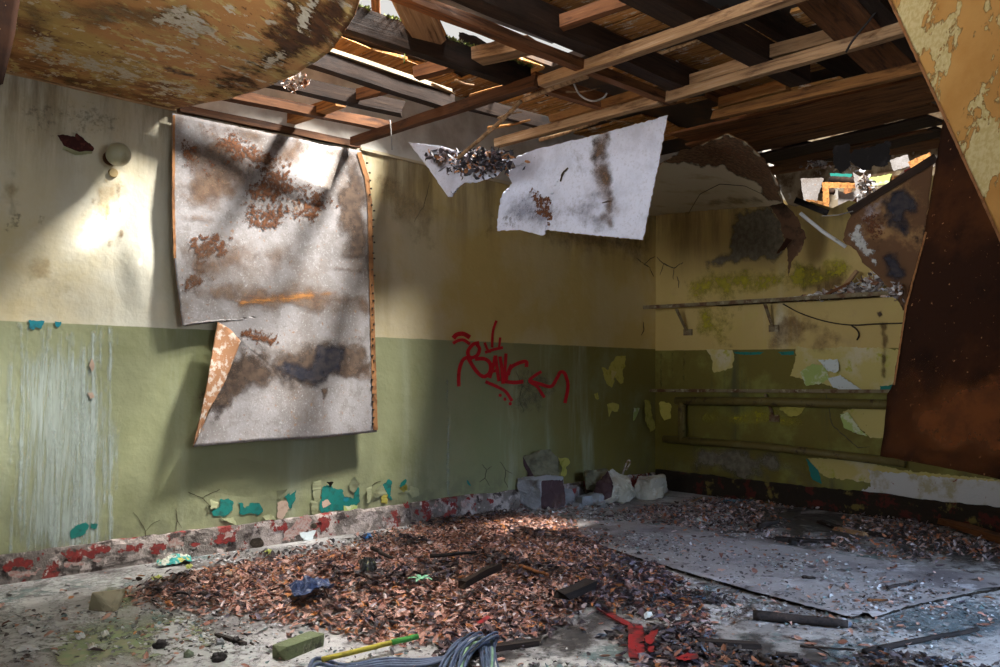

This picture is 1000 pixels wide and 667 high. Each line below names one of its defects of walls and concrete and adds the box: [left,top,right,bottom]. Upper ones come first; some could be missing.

peeling [529,188,553,226]
peeling [602,356,626,387]
peeling [706,349,763,373]
peeling [779,346,898,389]
water stain [19,333,113,547]
peeling [633,400,672,432]
peeling [840,409,886,438]
peeling [806,458,1000,507]
peeling [61,477,420,568]
peeling [3,553,44,581]